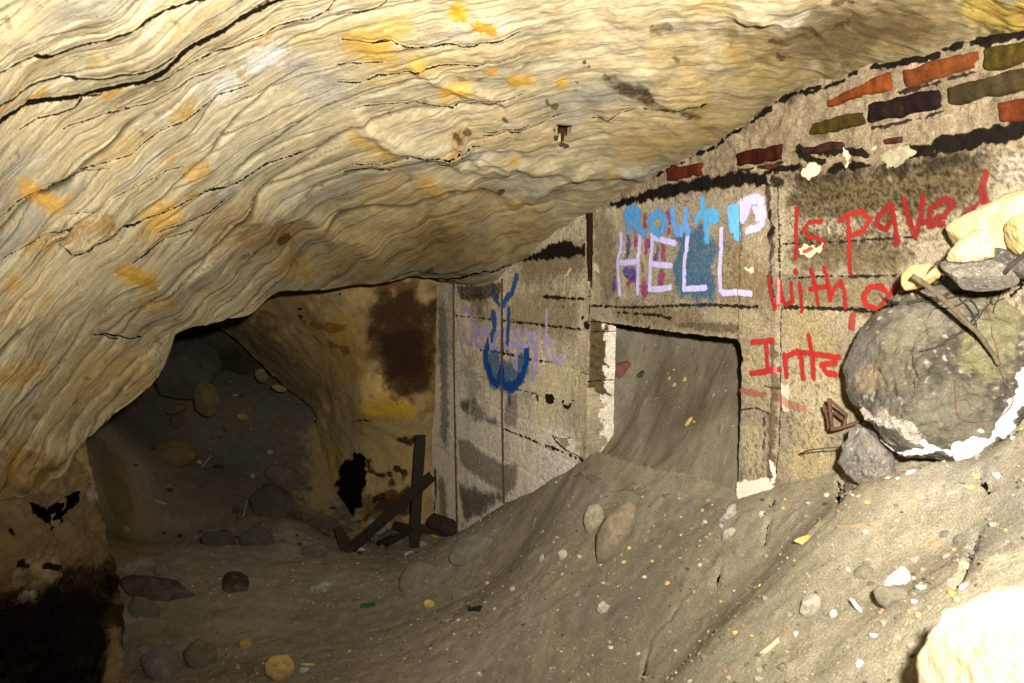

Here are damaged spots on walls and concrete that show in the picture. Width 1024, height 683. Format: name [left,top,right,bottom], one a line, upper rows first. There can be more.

water stain [460,394,518,427]
water stain [458,440,517,527]